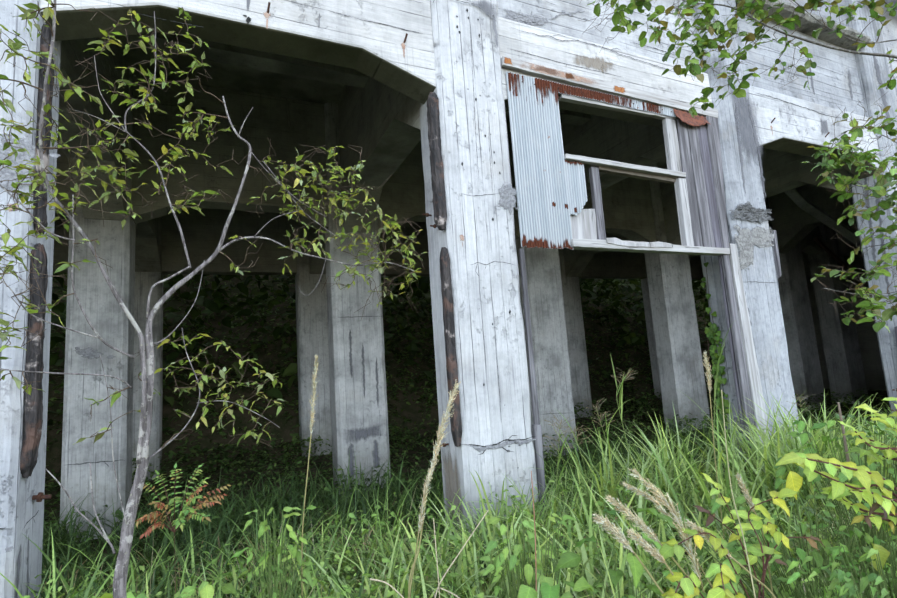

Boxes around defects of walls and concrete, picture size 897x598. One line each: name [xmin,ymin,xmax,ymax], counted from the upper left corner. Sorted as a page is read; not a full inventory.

corrosion [504,57,710,127]
spalling [464,151,519,213]
corrosion [522,235,574,250]
spalling [730,201,774,271]
water stain [349,330,365,396]
crack [462,435,535,455]